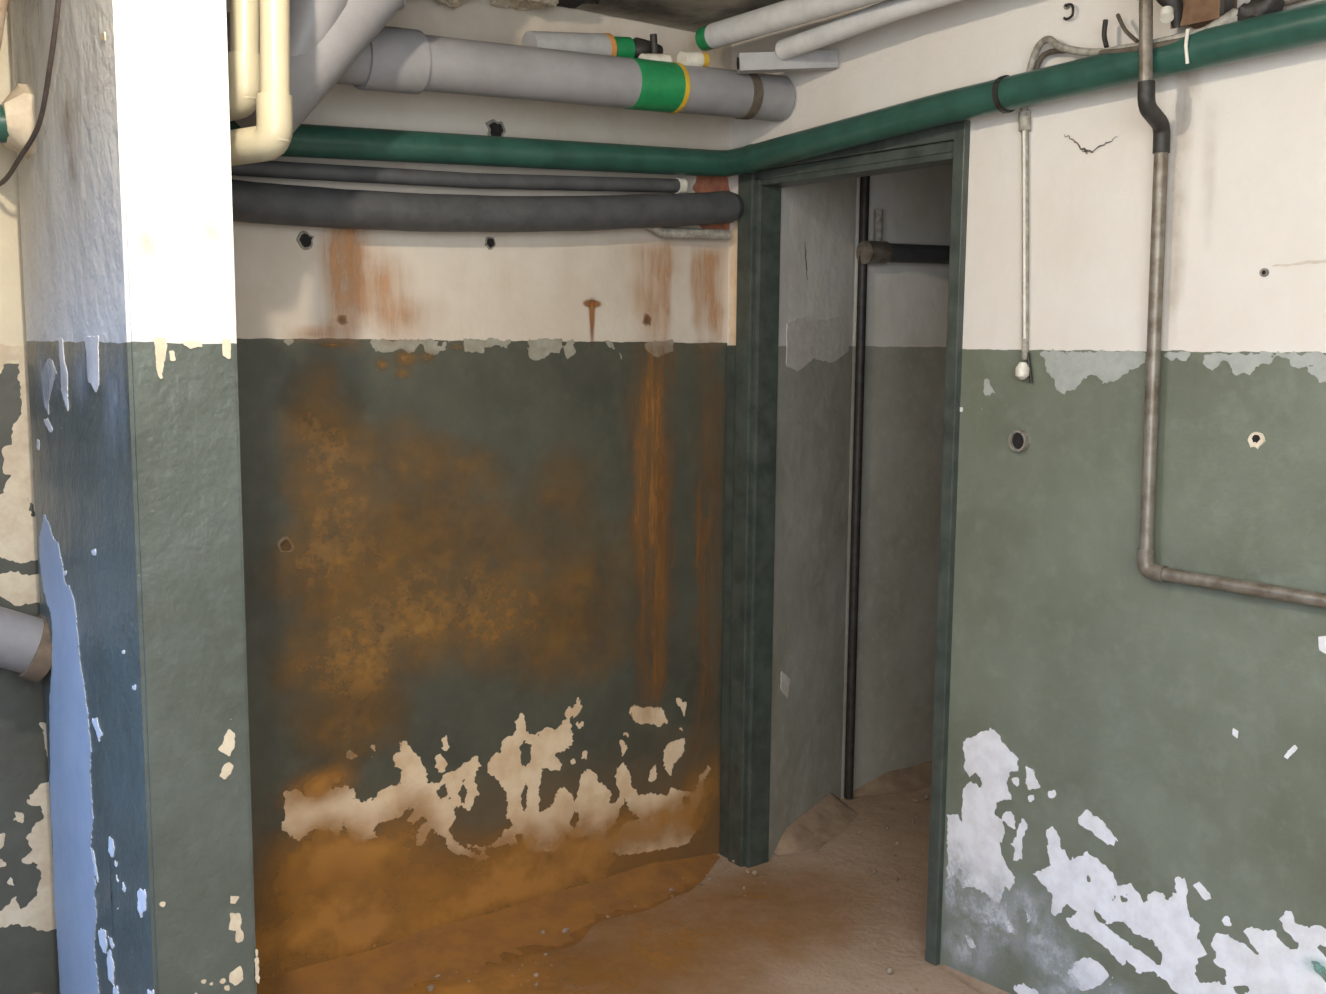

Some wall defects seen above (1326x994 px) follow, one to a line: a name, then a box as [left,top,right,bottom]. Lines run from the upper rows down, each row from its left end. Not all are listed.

rust [330,229,407,320]
rust [584,300,600,339]
peeling [1040,349,1146,394]
peeling [0,335,166,994]
peeling [218,719,235,779]
rust [296,768,346,800]
peeling [281,697,693,861]
peeling [946,728,1056,904]
peeling [1078,809,1118,846]
peeling [195,896,260,994]
rust [255,774,717,980]
peeling [1033,826,1326,994]